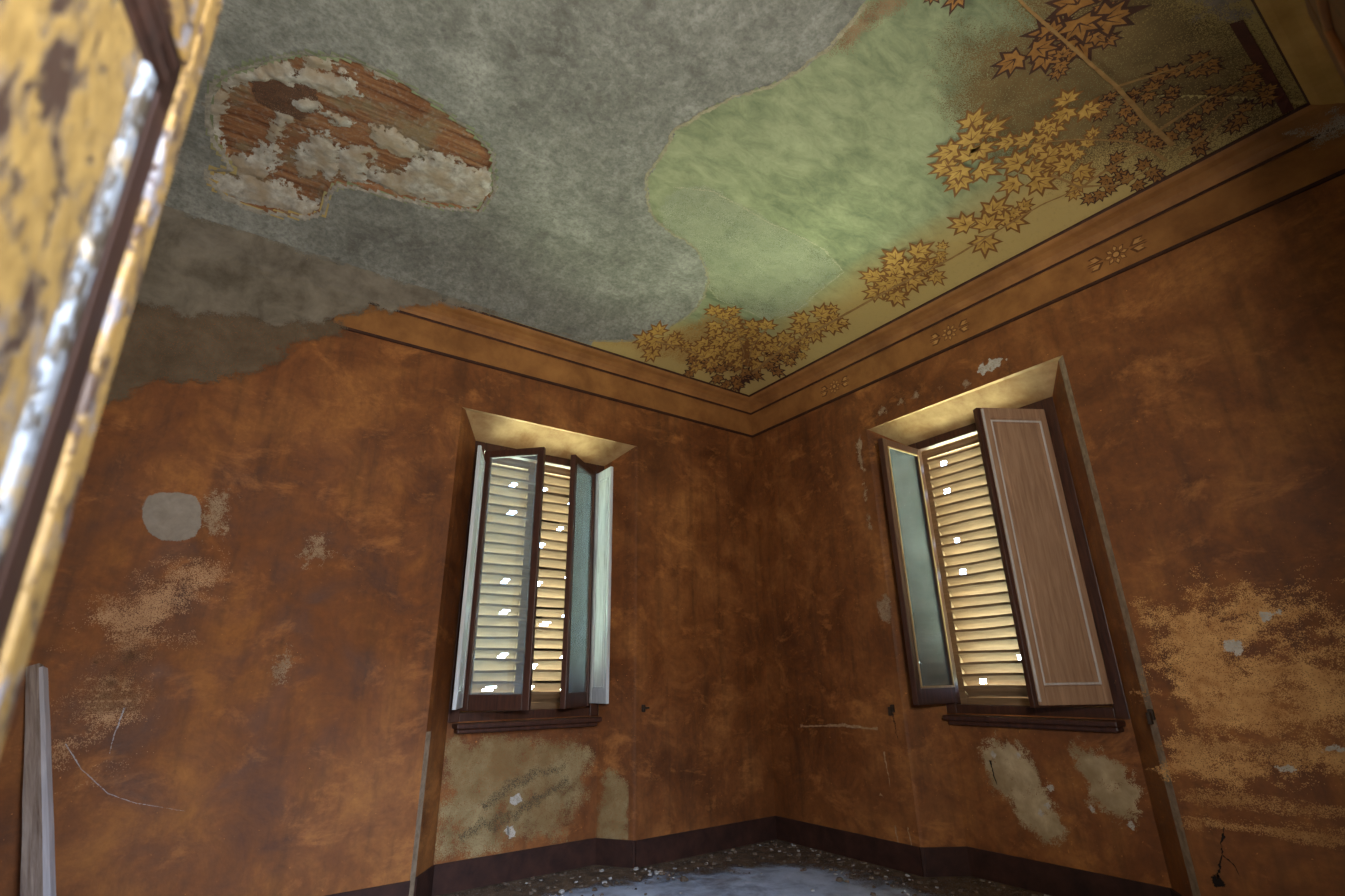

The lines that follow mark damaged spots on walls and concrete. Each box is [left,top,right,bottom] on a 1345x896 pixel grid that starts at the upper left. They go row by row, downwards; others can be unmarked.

peeling [101,0,867,419]
peeling [434,732,629,864]
peeling [977,733,1071,848]
damp [1178,787,1345,850]